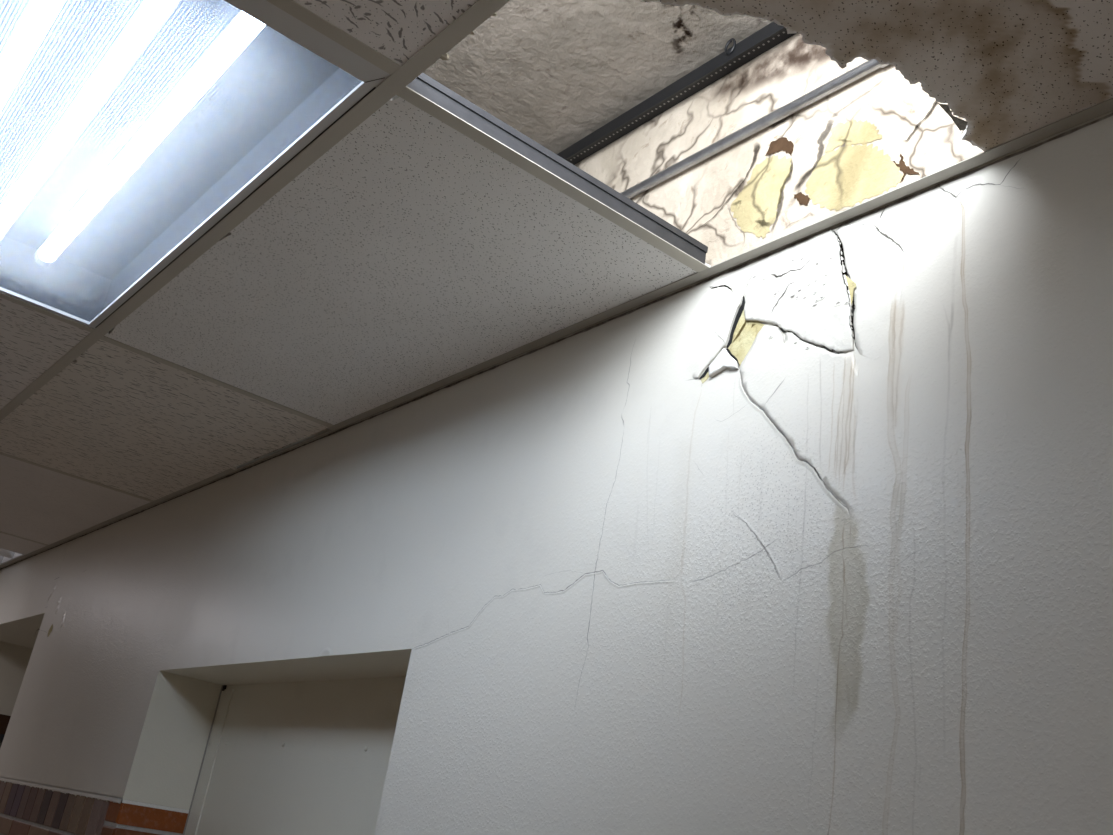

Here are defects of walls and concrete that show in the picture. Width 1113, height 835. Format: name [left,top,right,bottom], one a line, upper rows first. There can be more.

peeling [671,5,694,53]
peeling [731,119,920,238]
crack [772,212,902,354]
spalling [685,287,766,384]
crack [732,511,782,579]
crack [413,570,675,650]